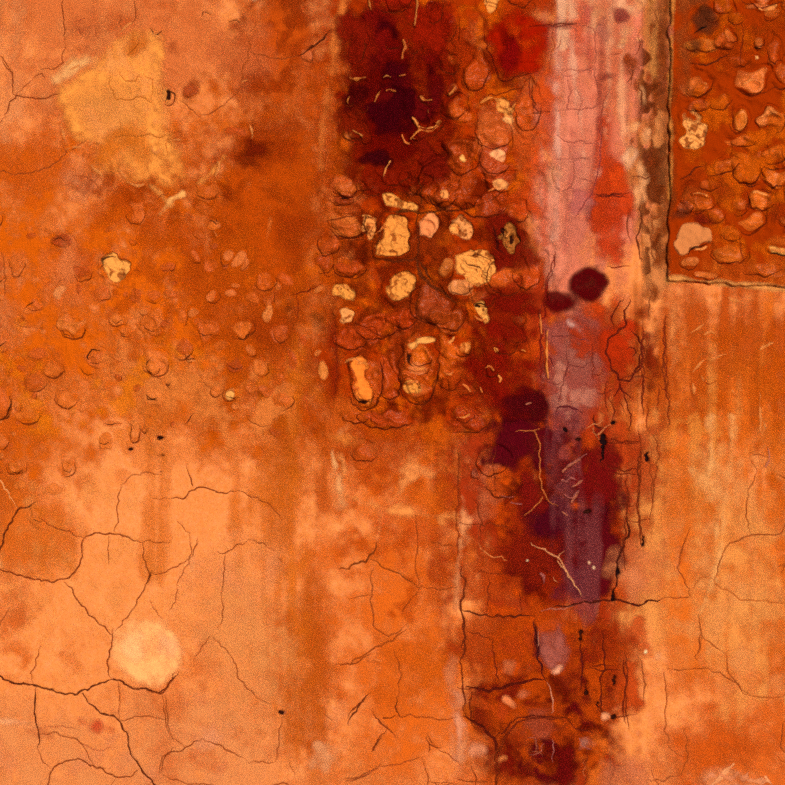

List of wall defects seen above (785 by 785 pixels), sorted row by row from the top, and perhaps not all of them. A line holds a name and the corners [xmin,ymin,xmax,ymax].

leakage [3,0,234,113]
corrosion [322,0,390,26]
spalling [362,193,418,256]
spalling [386,271,416,300]
spalling [456,250,496,286]
corrosion [591,120,633,263]
crack [539,254,785,607]
leakage [0,701,117,785]
crack [0,358,294,785]
leakage [113,544,330,785]
crack [340,455,592,785]
corrosion [481,671,580,751]